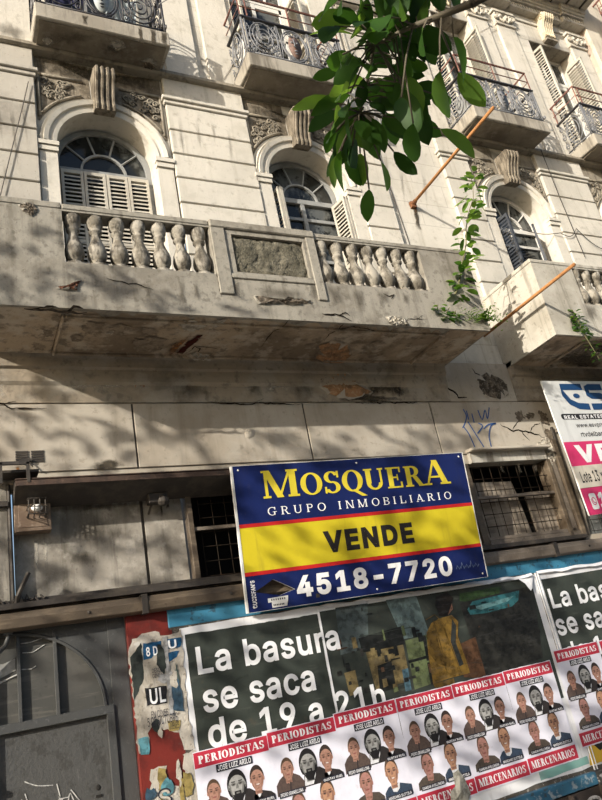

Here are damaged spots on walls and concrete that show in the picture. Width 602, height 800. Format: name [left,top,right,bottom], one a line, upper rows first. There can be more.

spalling [57,280,82,291]
spalling [253,295,312,305]
crack [24,305,87,315]
corrosion [170,335,202,355]
spalling [475,371,510,401]
crack [0,401,45,409]
crack [500,418,544,440]